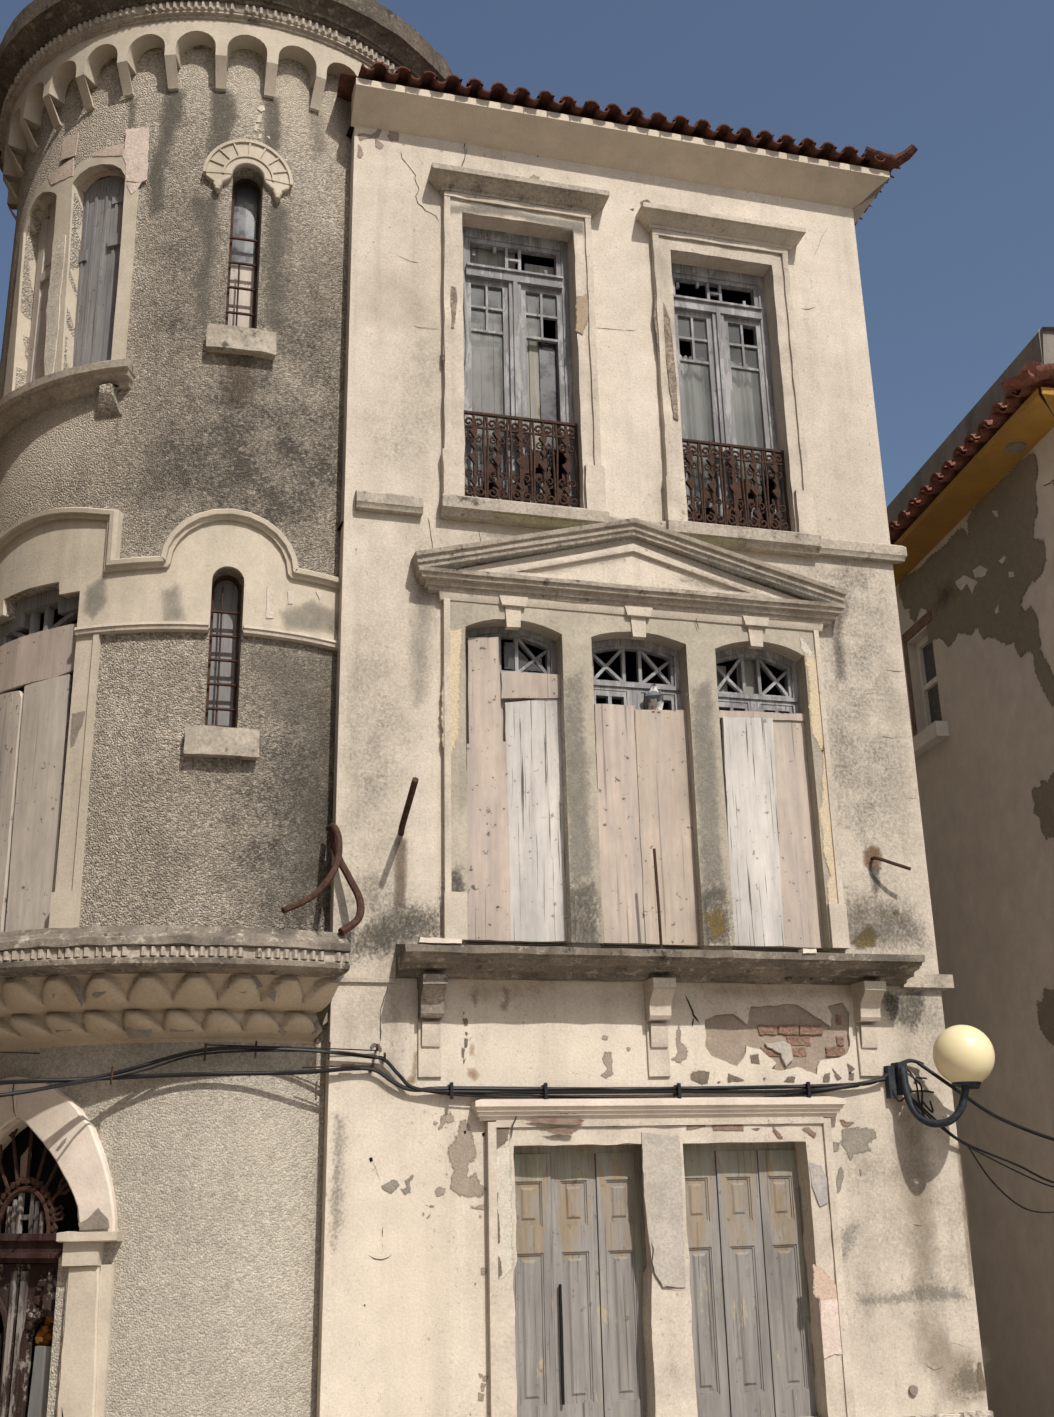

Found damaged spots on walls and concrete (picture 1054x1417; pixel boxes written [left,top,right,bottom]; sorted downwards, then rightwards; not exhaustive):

damp [149,90,183,212]
damp [208,92,236,153]
damp [265,98,280,151]
peeling [898,453,1054,707]
peeling [1031,772,1054,840]
corrosion [865,846,880,869]
spalling [671,1003,855,1084]
peeling [1036,987,1054,1045]
peeling [423,1111,514,1285]
peeling [527,1113,584,1135]
peeling [641,1124,783,1288]
peeling [809,1119,877,1207]